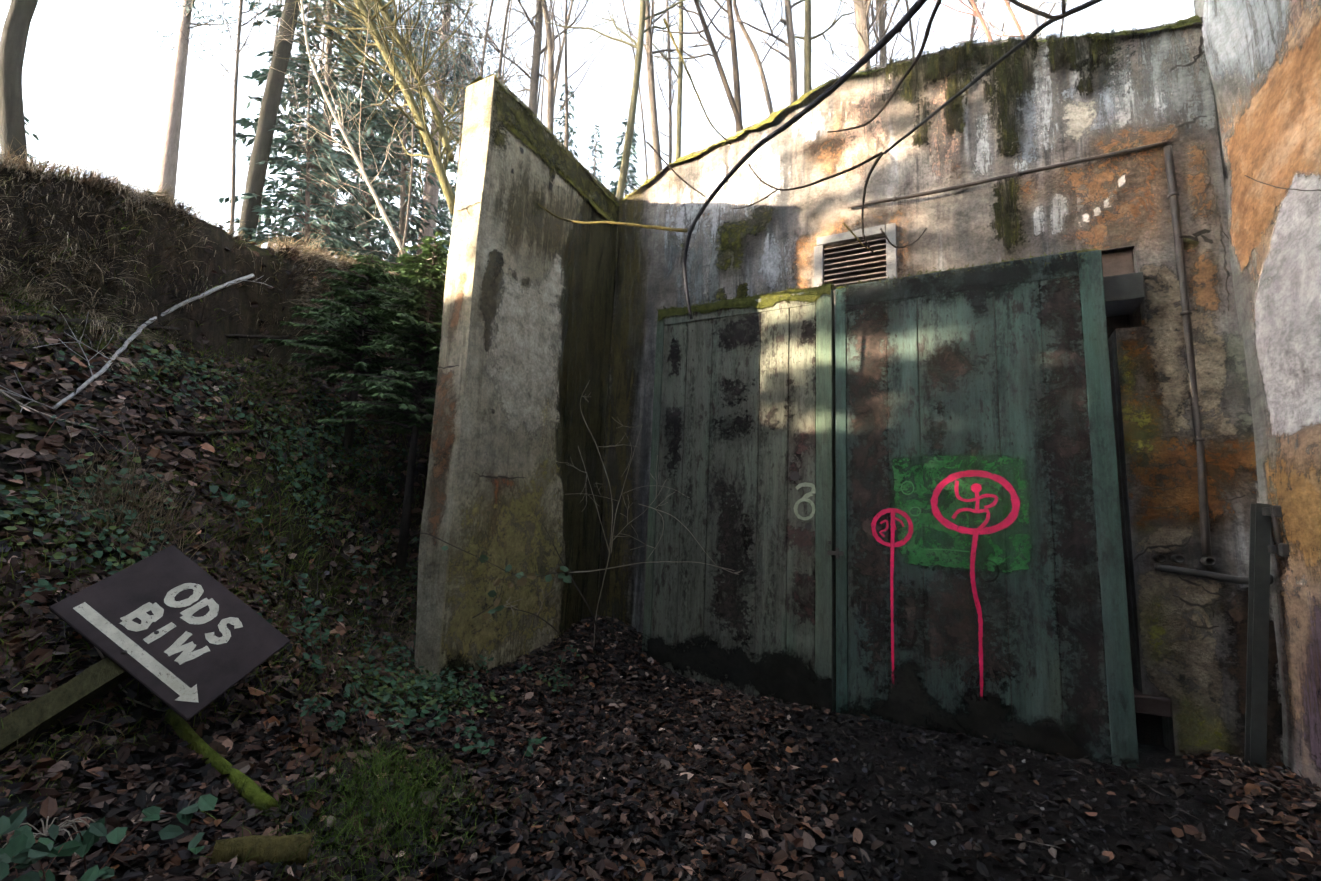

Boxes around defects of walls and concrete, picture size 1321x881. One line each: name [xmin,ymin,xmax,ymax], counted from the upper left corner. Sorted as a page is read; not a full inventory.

damp [793,105,831,141]
damp [971,114,993,178]
damp [657,131,800,308]
damp [1033,194,1084,236]
damp [480,199,618,635]